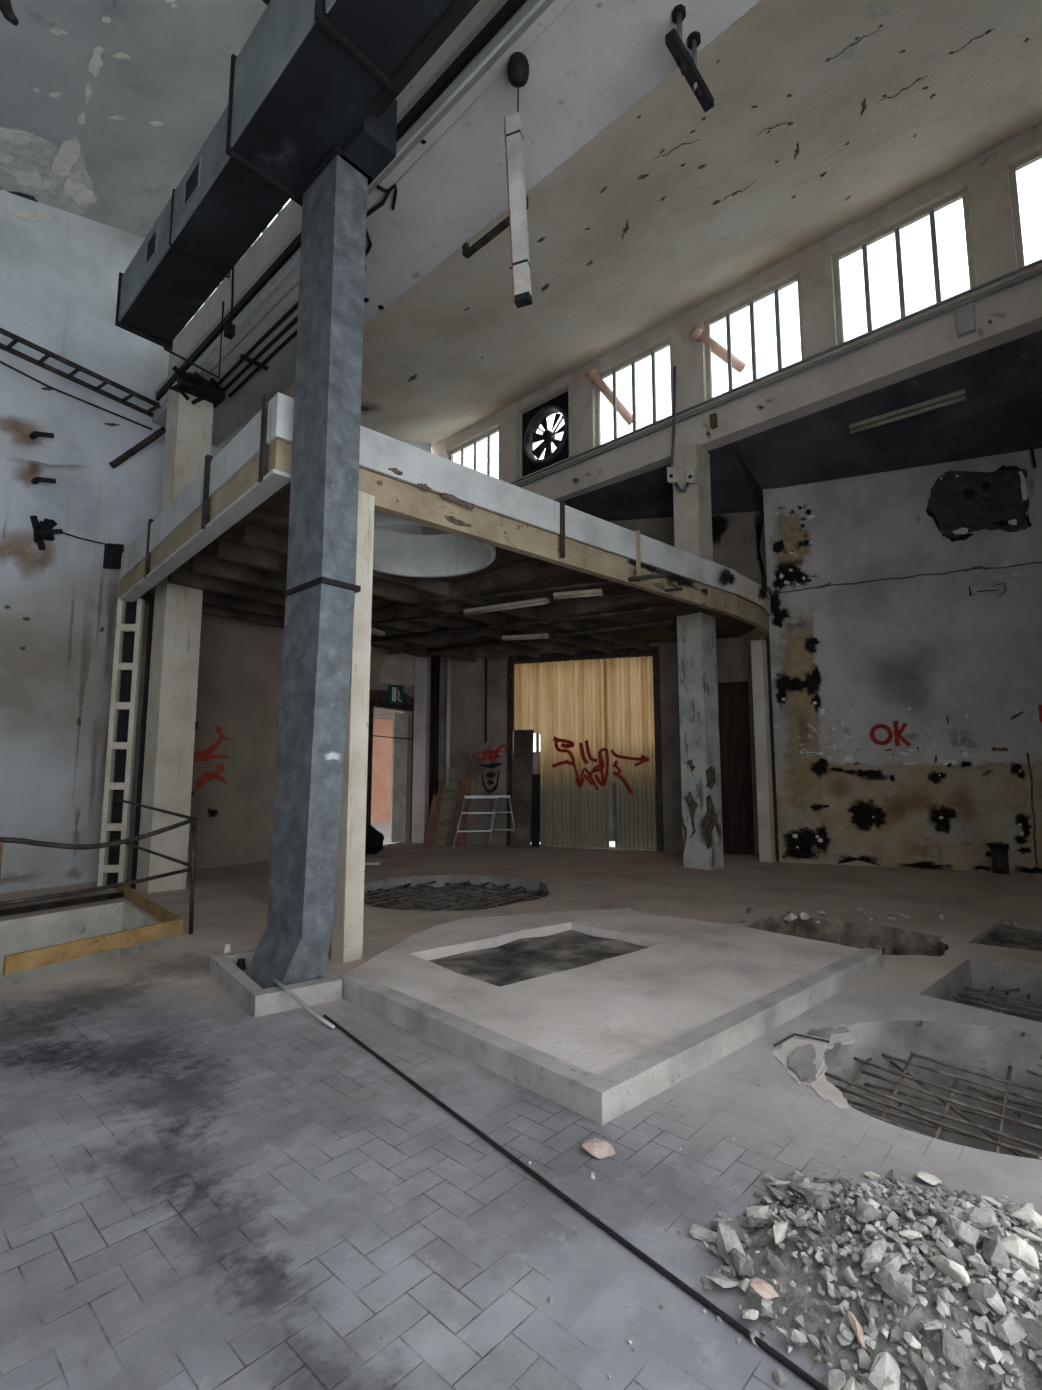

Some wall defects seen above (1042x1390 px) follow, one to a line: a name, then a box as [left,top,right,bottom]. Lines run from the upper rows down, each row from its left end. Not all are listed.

crack [825,28,880,62]
peeling [0,45,131,215]
crack [861,76,927,117]
spalling [926,465,1032,542]
flaking render [772,505,819,582]
peeling [681,759,721,853]
spalling [745,915,1042,1159]